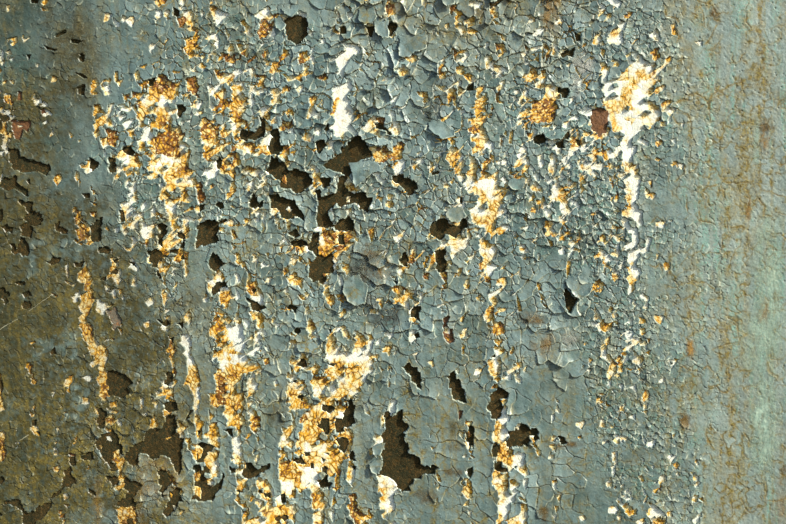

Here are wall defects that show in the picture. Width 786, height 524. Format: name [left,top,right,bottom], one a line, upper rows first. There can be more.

peeling [55,30,85,62]
peeling [0,35,62,256]
peeling [16,281,32,309]
peeling [65,0,676,524]
peeling [30,405,40,436]
peeling [2,453,76,524]